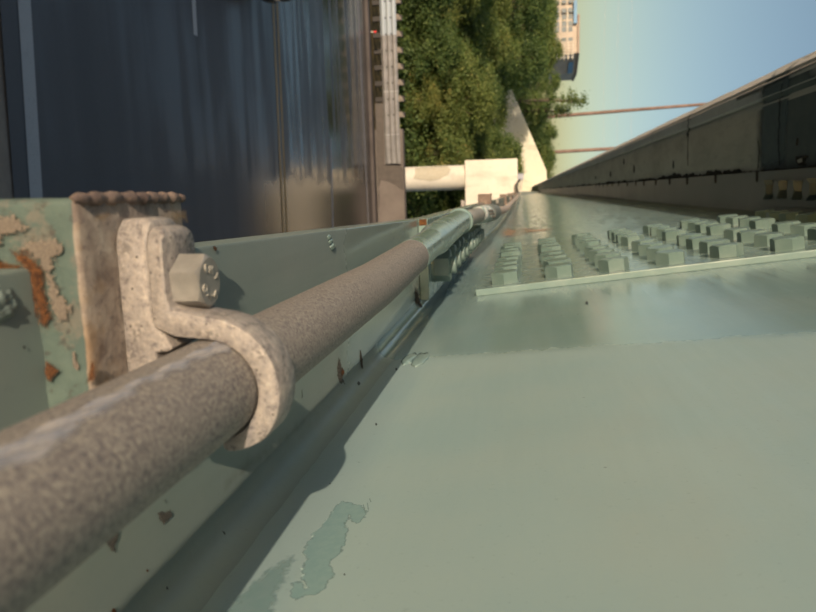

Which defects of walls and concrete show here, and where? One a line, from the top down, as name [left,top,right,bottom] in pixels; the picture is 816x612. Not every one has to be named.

peeling [0,214,29,244]
corrosion [0,250,53,326]
peeling [16,238,72,321]
peeling [158,509,173,525]
peeling [229,559,292,612]
peeling [290,498,371,600]